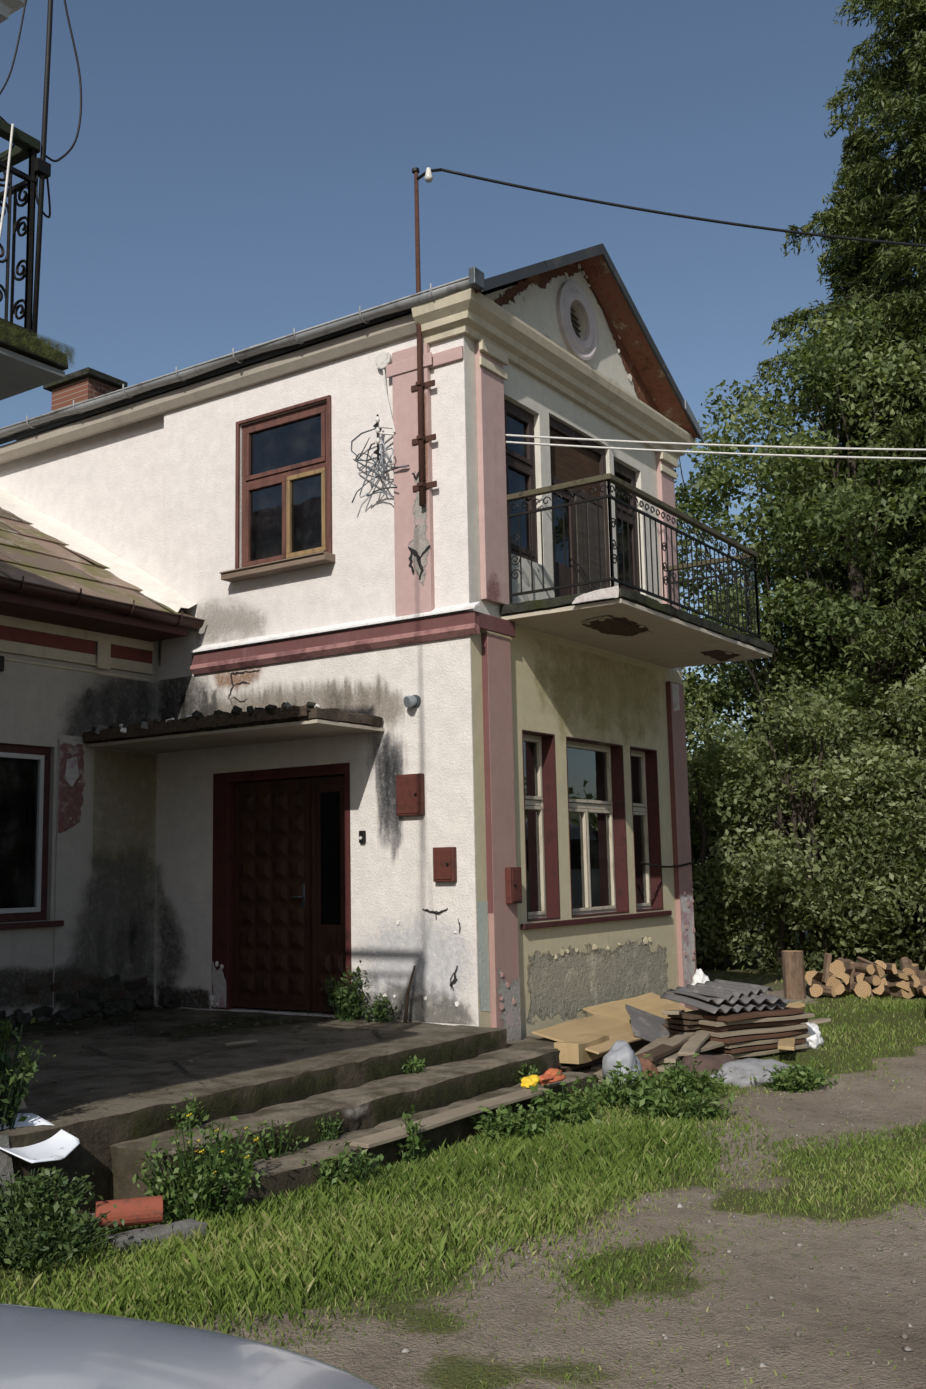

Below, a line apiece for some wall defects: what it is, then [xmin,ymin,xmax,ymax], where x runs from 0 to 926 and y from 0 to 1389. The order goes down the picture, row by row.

flaking render [494,263,661,414]
spalling [572,586,651,639]
spalling [58,702,320,833]
water stain [67,675,402,854]
water stain [64,853,184,996]
flaking render [477,888,695,1041]